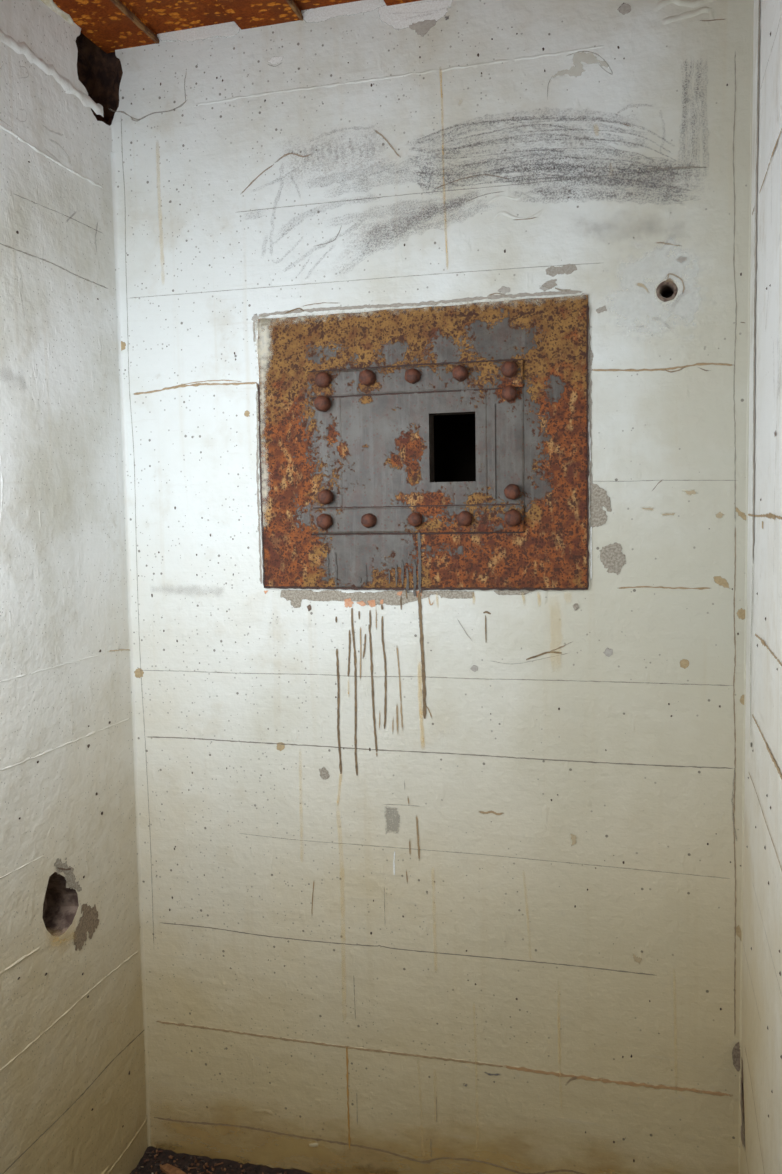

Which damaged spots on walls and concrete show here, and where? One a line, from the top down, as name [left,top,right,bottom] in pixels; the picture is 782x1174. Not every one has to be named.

crack [134,380,256,395]
corrosion [258,303,589,719]
crack [153,0,782,1034]
corrosion [336,605,403,776]
spalling [54,858,99,951]
crack [155,1117,584,1174]
spalling [732,1042,745,1146]